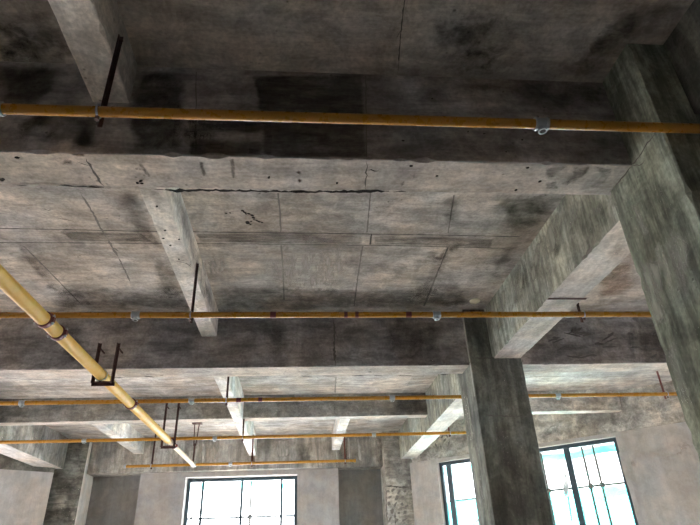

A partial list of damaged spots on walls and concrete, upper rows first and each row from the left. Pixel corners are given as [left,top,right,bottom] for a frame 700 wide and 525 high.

crack [59,159,130,281]
crack [140,162,406,193]